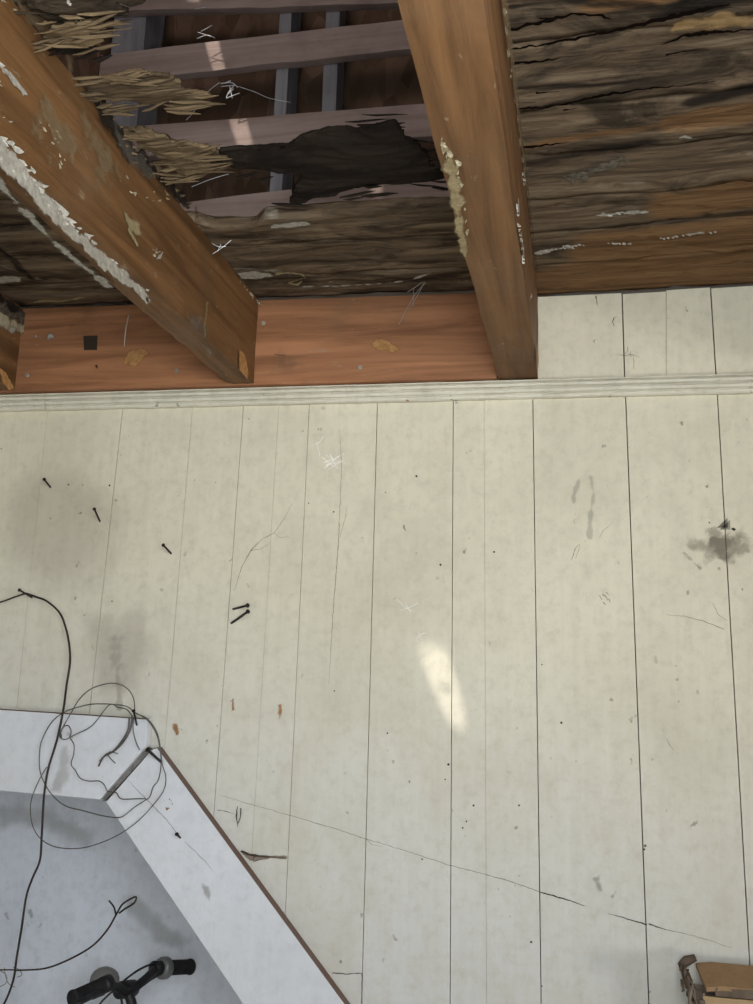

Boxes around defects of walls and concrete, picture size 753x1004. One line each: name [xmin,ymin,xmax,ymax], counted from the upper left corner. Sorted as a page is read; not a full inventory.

spalling [1,0,133,69]
crack [487,0,753,148]
peeling [35,97,112,179]
spalling [123,125,233,202]
peeling [502,0,584,264]
peeling [0,136,150,304]
crack [225,796,584,906]
crack [611,914,731,948]